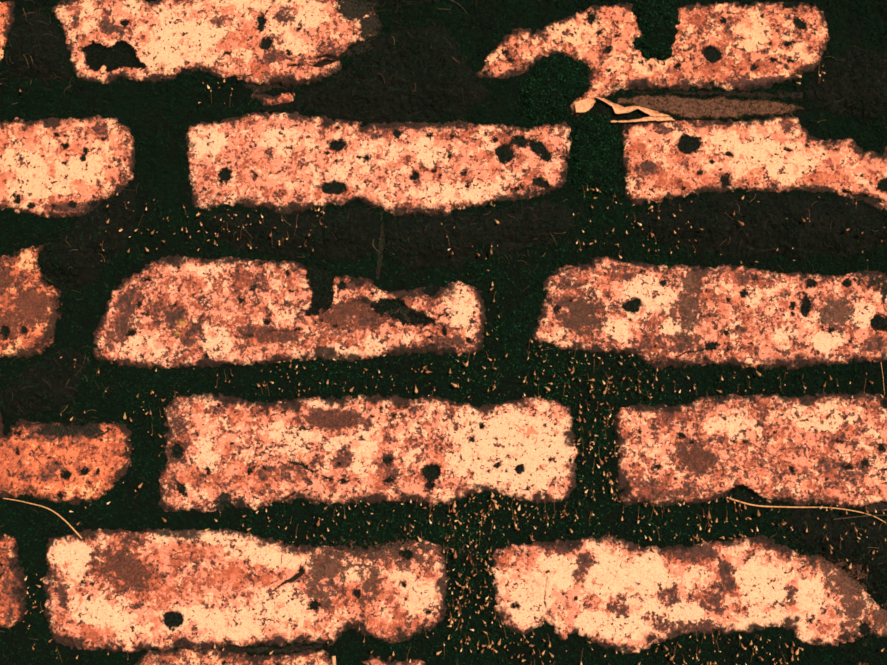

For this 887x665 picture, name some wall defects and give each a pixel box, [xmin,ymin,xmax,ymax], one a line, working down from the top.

spalling [82,40,147,73]
hole [36,449,100,485]
hole [487,454,525,475]